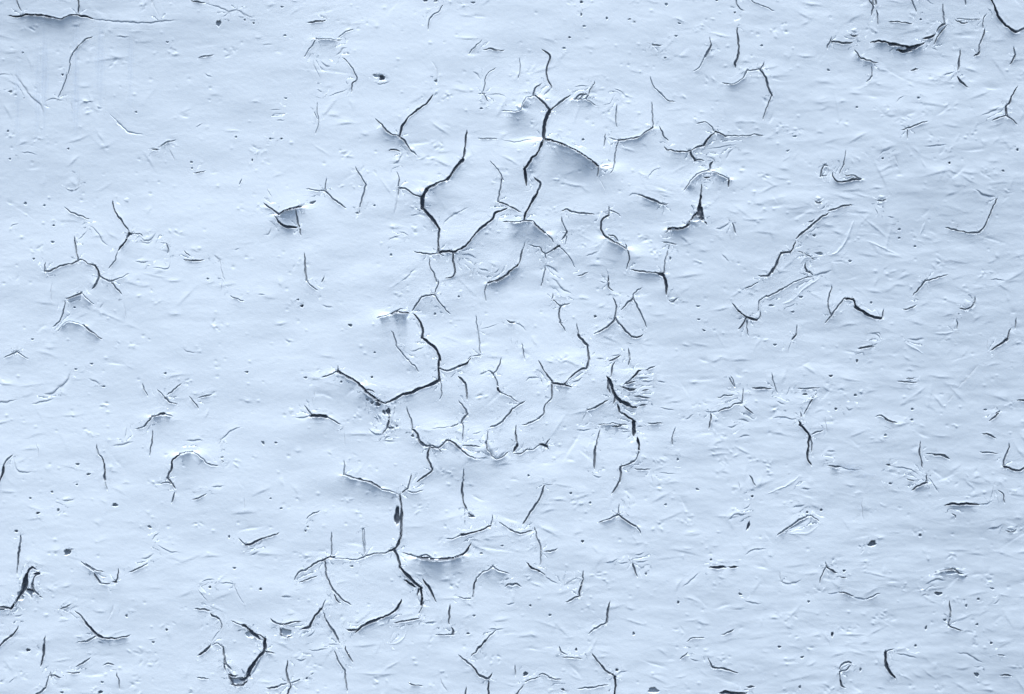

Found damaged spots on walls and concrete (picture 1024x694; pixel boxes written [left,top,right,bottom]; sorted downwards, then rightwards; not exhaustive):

peeling [567,75,602,114]
crack [896,114,933,144]
crack [820,0,1024,132]
crack [38,197,175,347]
peeling [256,194,326,242]
crack [131,0,836,694]
crack [724,146,952,358]
crack [0,529,136,694]